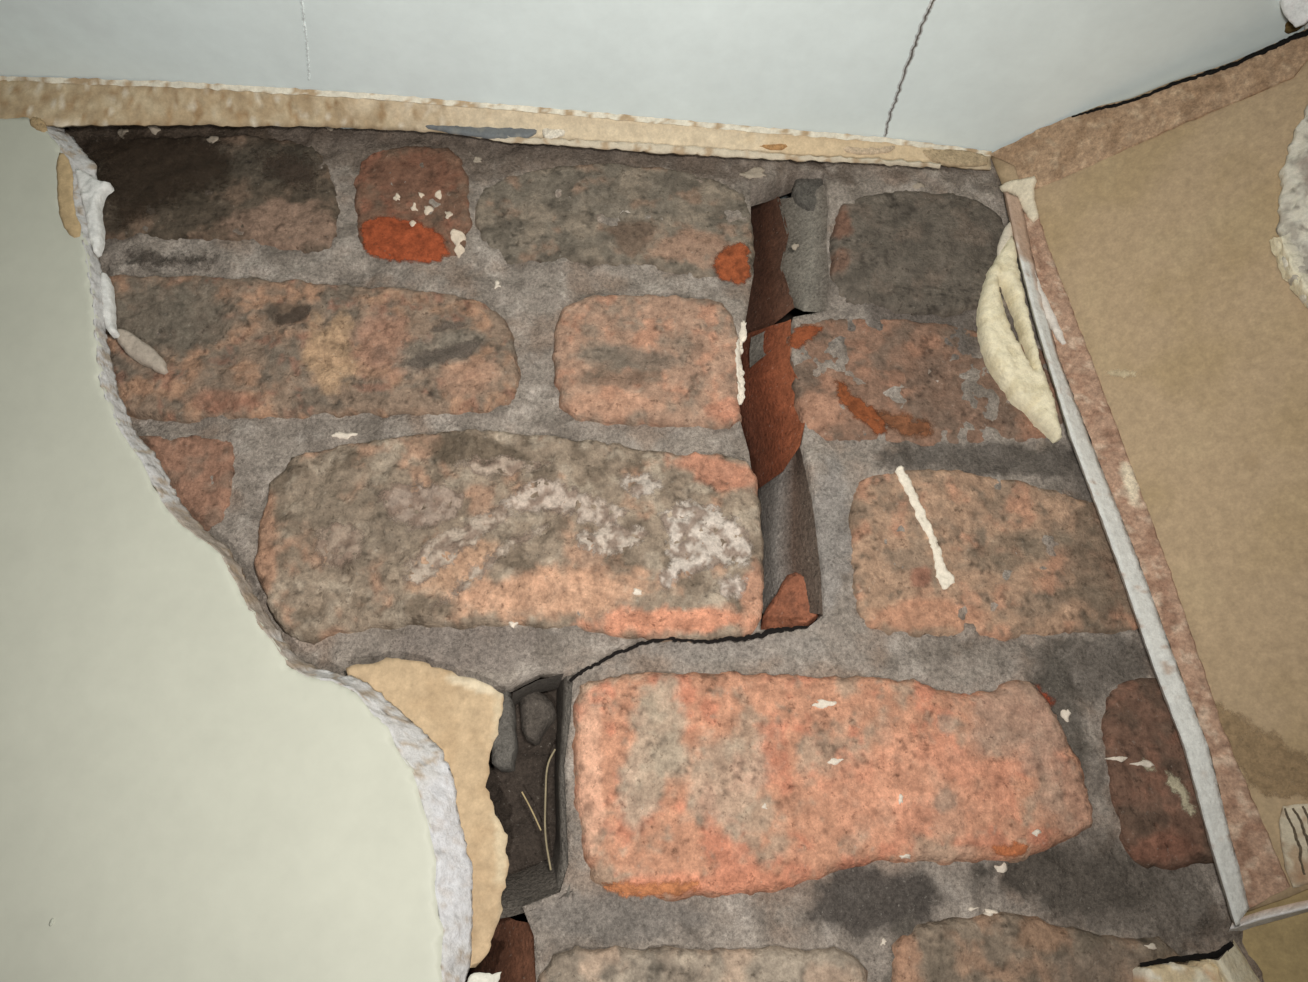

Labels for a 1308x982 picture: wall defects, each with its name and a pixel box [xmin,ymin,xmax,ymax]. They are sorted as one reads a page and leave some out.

peeling [0,36,1308,190]
crack [883,0,936,137]
peeling [1279,0,1308,29]
peeling [56,153,168,375]
spalling [359,216,450,264]
spalling [713,242,751,284]
spalling [1269,105,1308,308]
spalling [788,324,823,349]
spalling [837,381,933,437]
crack [465,178,829,982]
spalling [992,176,1308,931]
spalling [1200,940,1260,982]